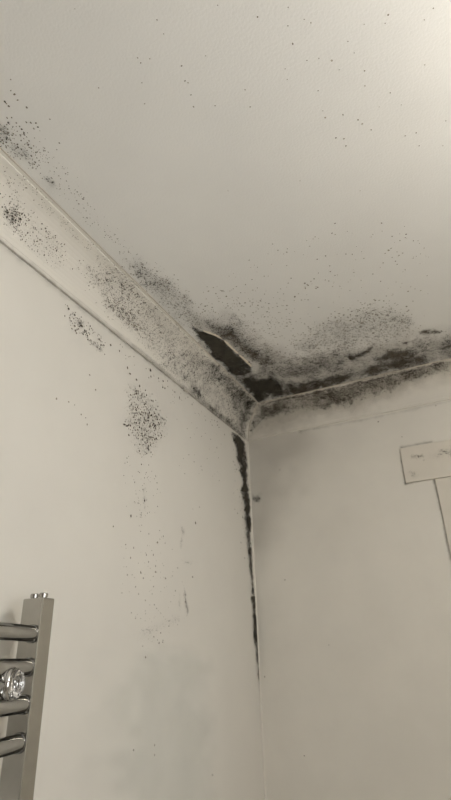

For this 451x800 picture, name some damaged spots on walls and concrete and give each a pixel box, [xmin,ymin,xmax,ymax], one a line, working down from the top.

damp [0,117,95,263]
peeling [193,327,252,377]
damp [64,242,451,678]